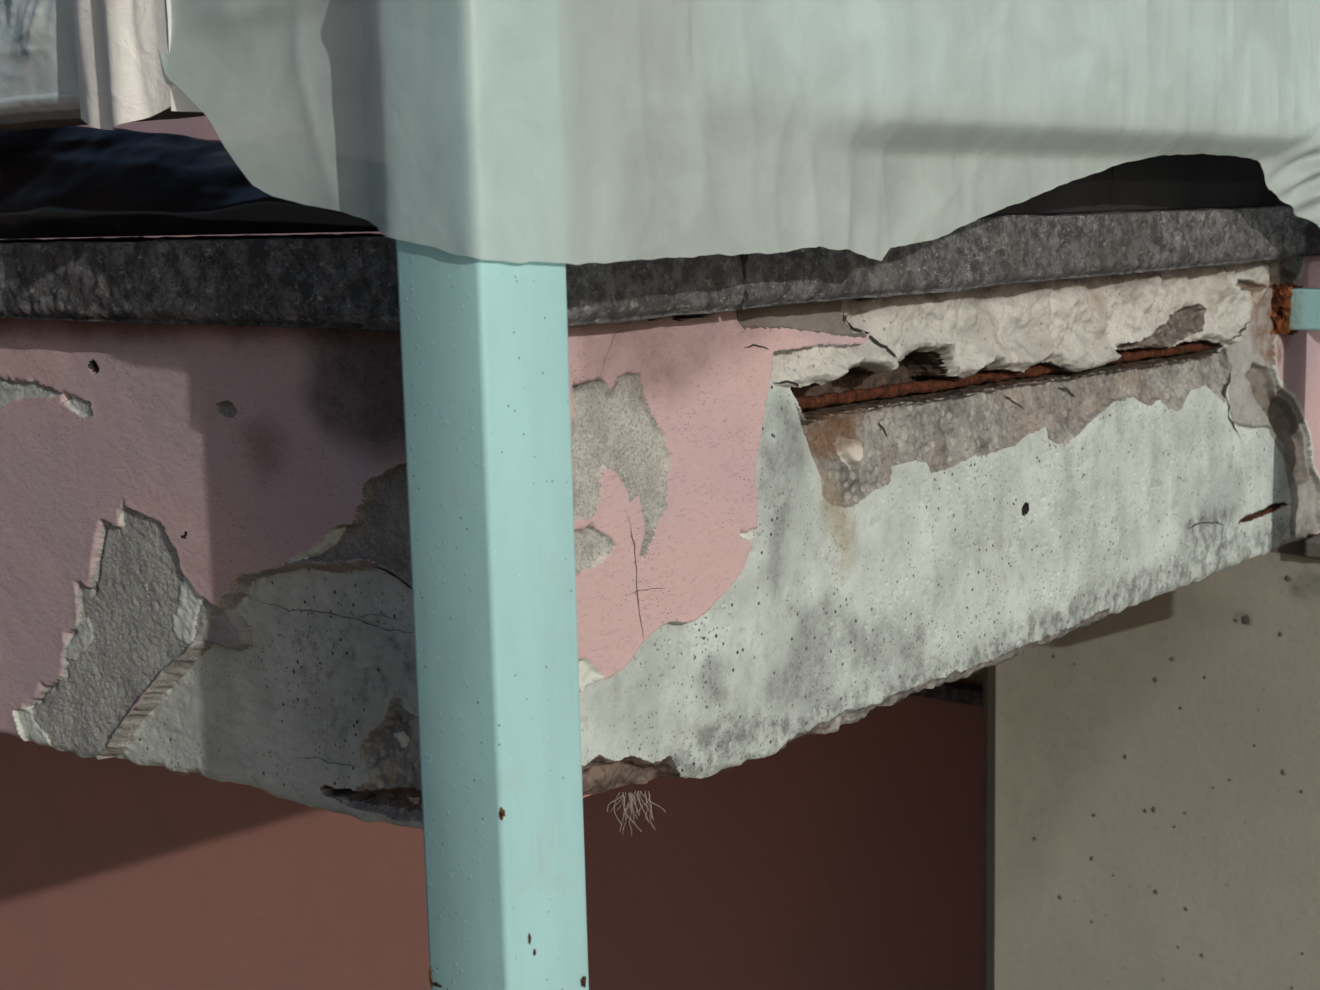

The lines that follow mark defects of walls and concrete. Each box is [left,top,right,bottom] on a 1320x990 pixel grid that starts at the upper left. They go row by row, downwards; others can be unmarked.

peeling [0,377,93,419]
spalling [12,463,423,829]
spalling [572,257,1320,795]